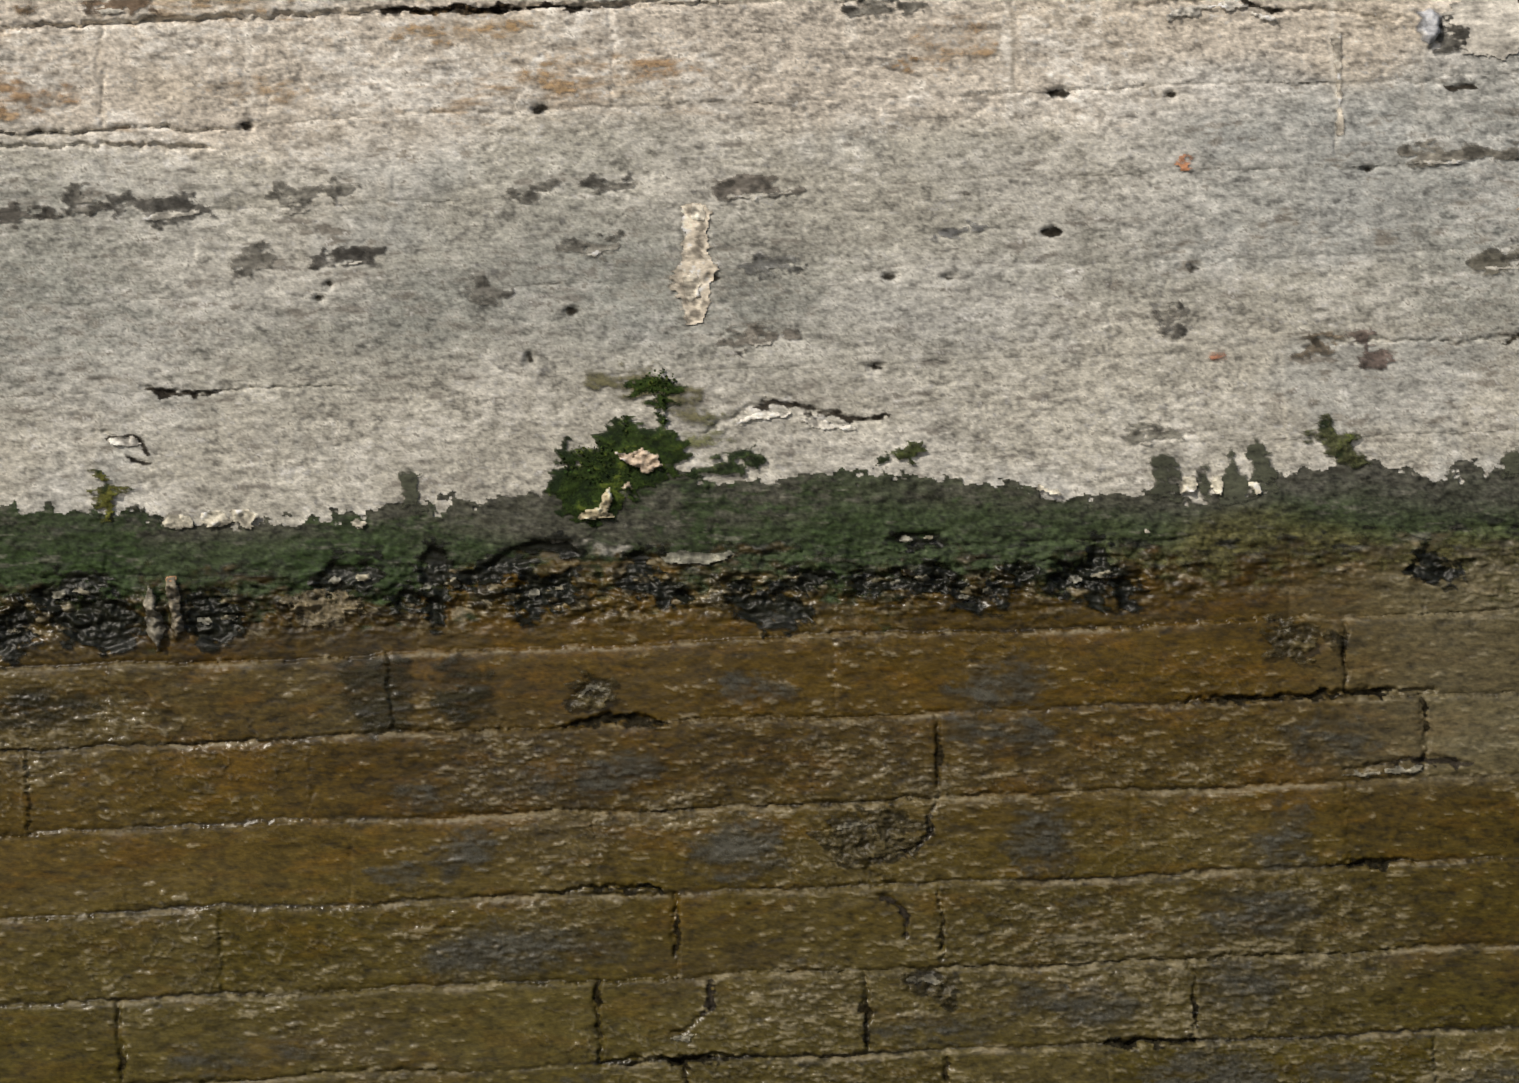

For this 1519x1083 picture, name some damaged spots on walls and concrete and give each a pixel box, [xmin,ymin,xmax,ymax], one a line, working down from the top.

crack [1166,0,1285,21]
peeling [668,173,807,325]
spalling [716,321,802,356]
crack [1502,332,1519,345]
crack [735,399,890,432]
spalling [0,564,252,670]
spalling [278,530,587,634]
spalling [614,542,735,609]
spalling [723,530,1152,638]
crack [590,883,681,955]
crack [593,980,603,1037]
crack [655,979,729,1083]